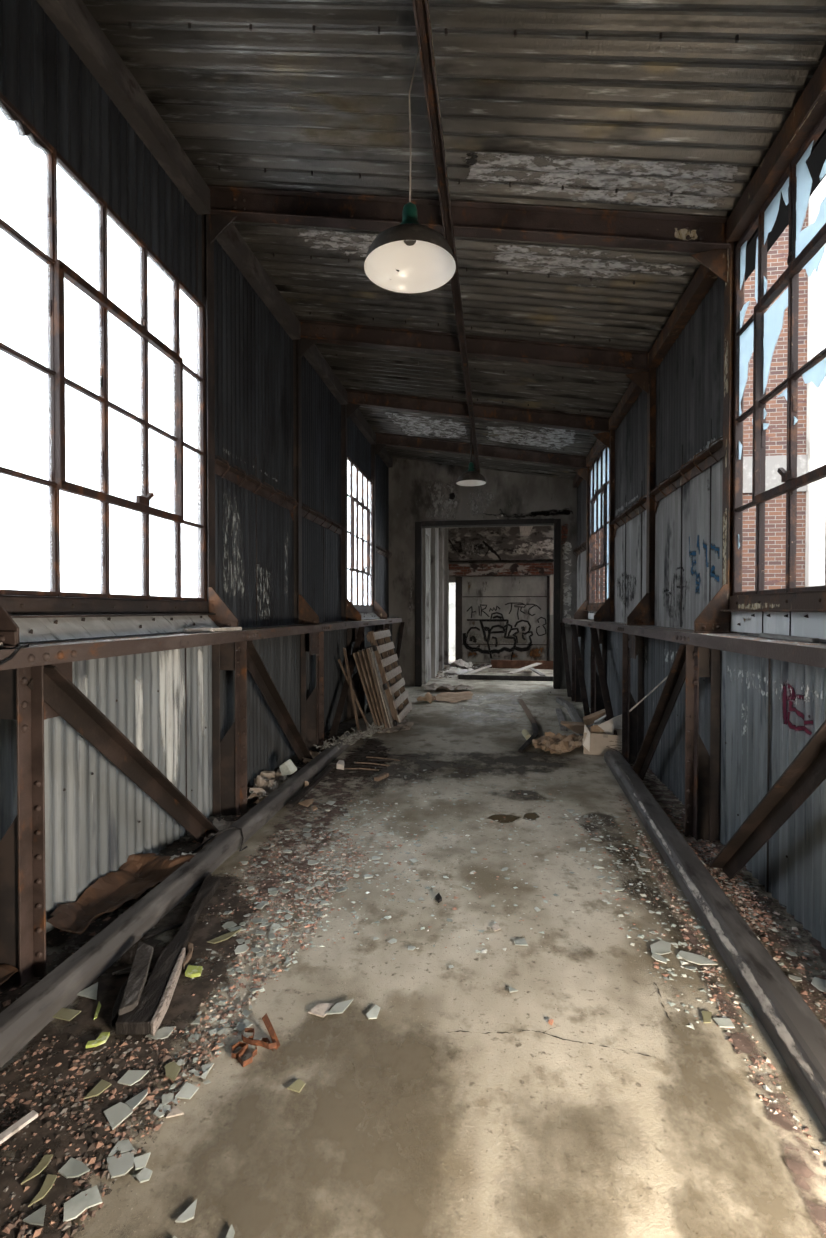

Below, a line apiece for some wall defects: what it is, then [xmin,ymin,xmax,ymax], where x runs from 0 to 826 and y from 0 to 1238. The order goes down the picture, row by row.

peeling [465,152,738,210]
peeling [295,227,378,257]
peeling [492,245,686,287]
crack [448,1027,656,1058]